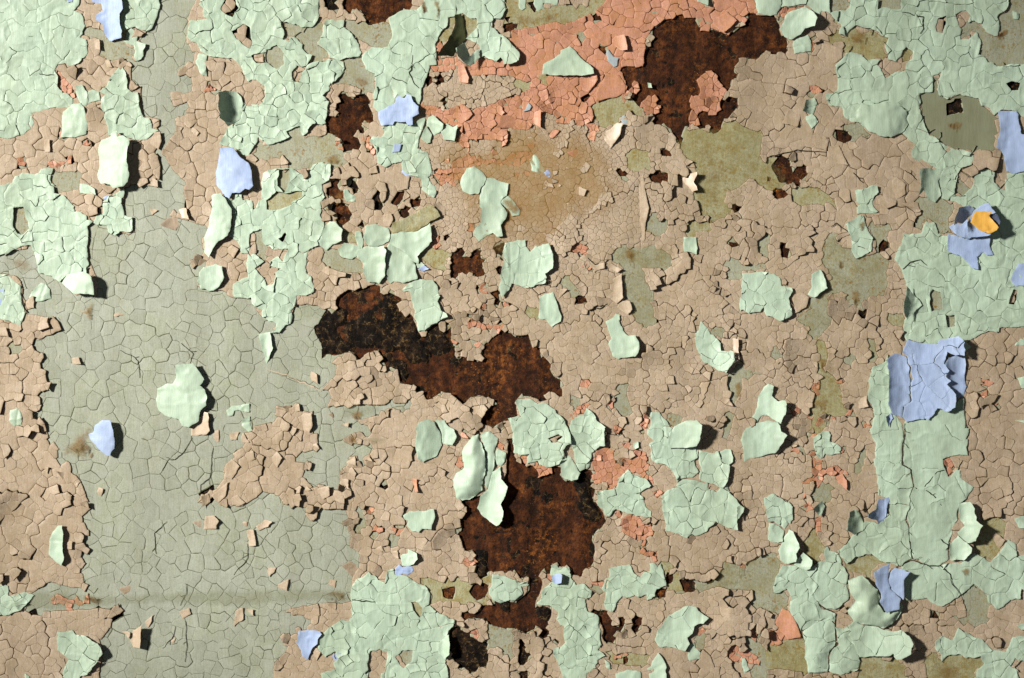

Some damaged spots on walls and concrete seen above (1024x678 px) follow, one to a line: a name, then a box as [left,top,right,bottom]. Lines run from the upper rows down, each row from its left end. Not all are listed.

peeling [0,0,161,354]
rust [326,94,373,165]
peeling [187,0,817,363]
rust [621,14,787,145]
crack [769,149,822,157]
crack [0,0,411,678]
rust [314,285,562,427]
rust [449,439,606,678]
peeling [477,321,752,678]
spalling [678,0,1024,678]
crack [902,424,943,505]
crack [902,532,961,595]